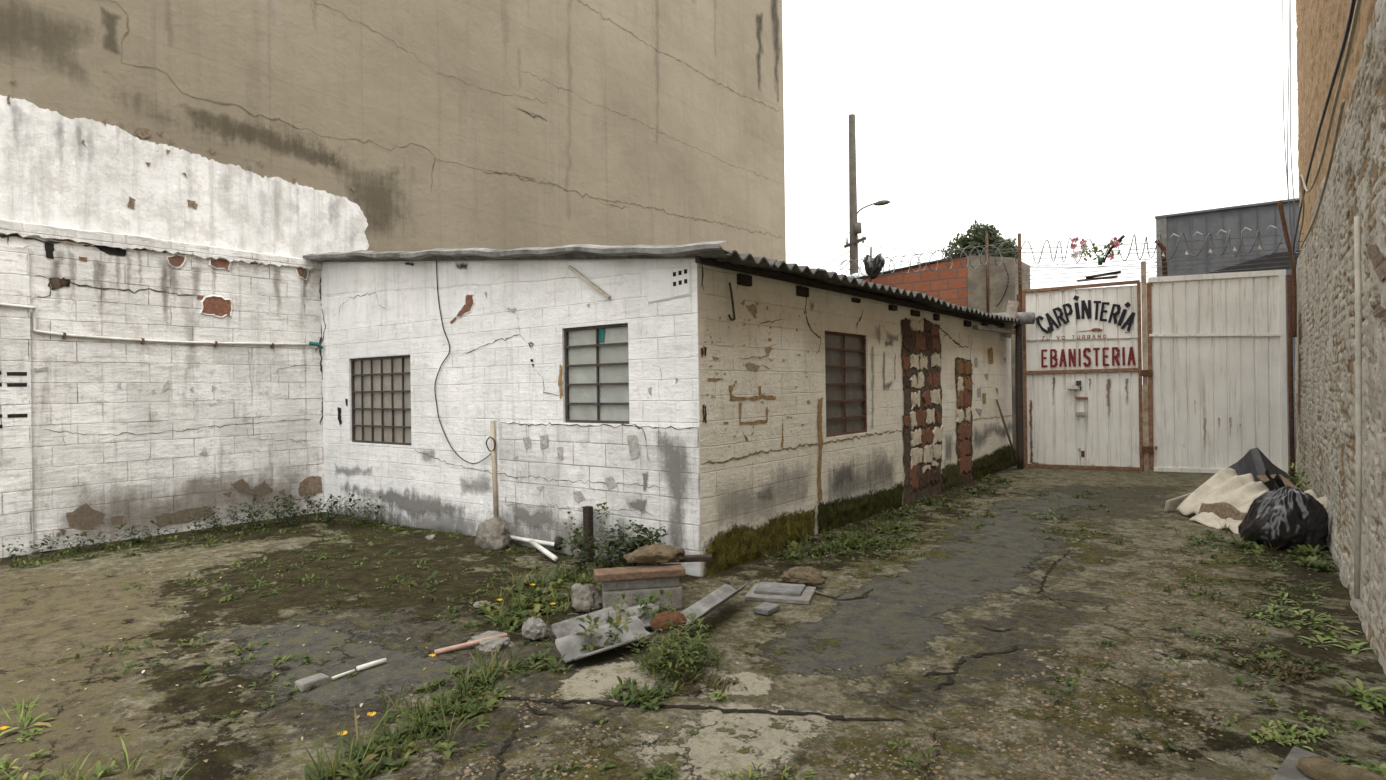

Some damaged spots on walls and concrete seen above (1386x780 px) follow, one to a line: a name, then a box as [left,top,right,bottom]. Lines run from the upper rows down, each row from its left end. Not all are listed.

water stain [103,10,117,52]
water stain [191,111,335,164]
crack [517,108,547,121]
spalling [44,239,94,261]
crack [0,233,197,299]
flaking render [165,253,187,269]
peeling [702,299,823,502]
flaking render [883,317,1006,505]
peeling [233,476,323,497]
water stain [338,468,476,536]
water stain [829,461,892,497]
water stain [502,506,639,561]